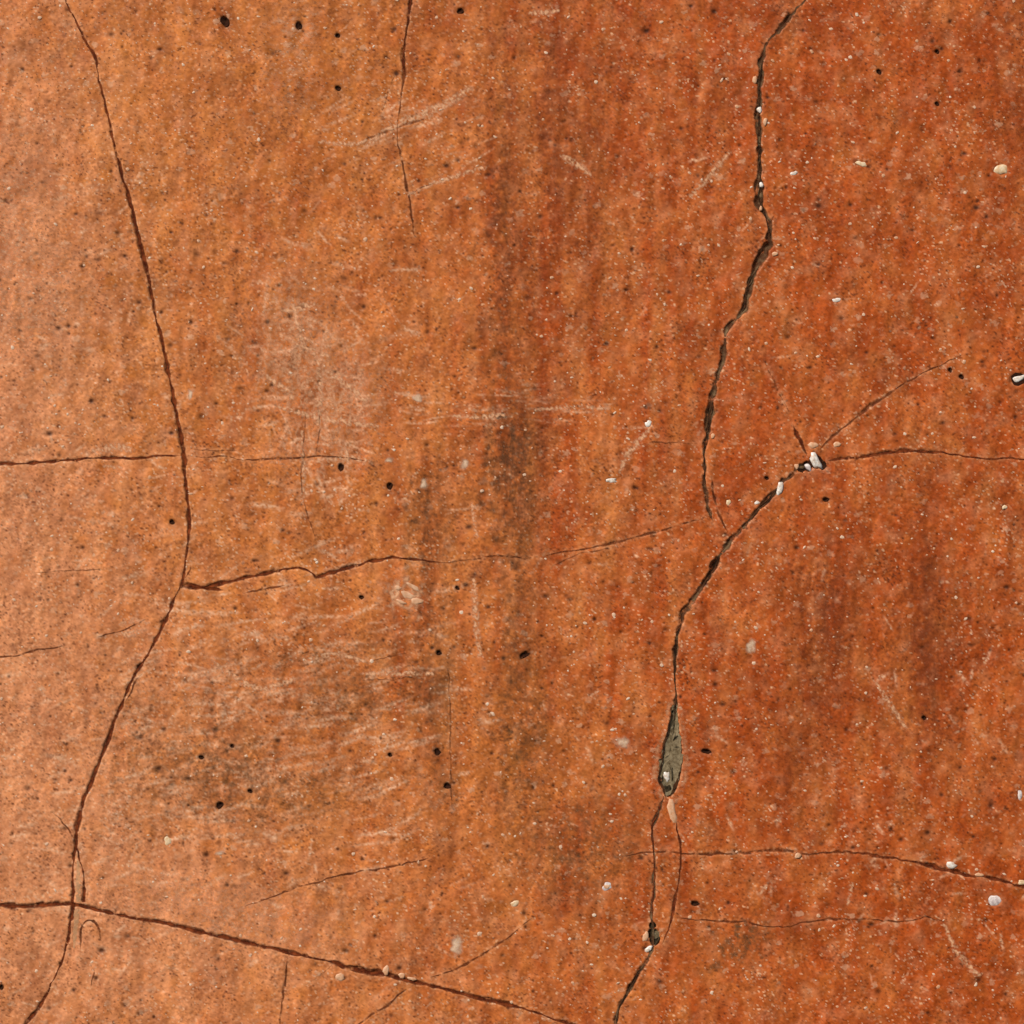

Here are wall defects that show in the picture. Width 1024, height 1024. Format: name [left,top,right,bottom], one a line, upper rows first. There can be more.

crack [0,0,574,1024]
spalling [653,705,686,823]
crack [553,0,1024,714]
crack [614,797,1024,1024]